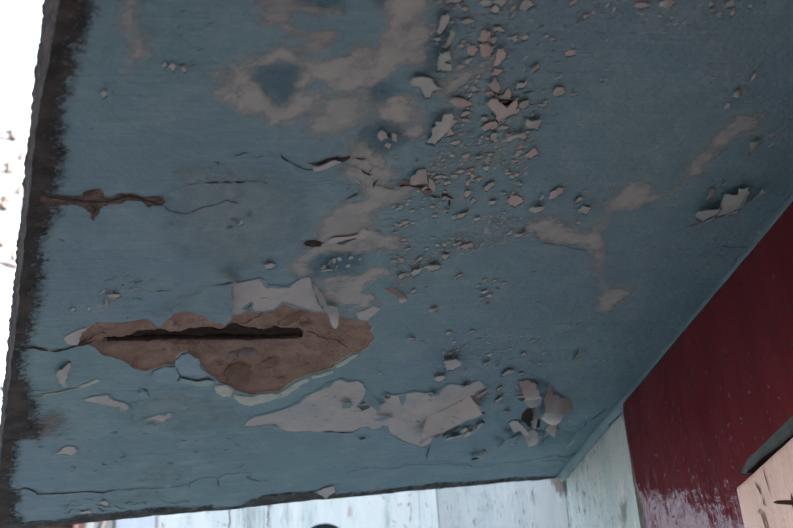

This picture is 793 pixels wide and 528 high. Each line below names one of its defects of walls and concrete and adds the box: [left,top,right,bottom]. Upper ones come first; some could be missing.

crack [40,152,452,221]
crack [304,228,372,247]
peeling [375,0,773,304]
spalling [64,263,589,460]